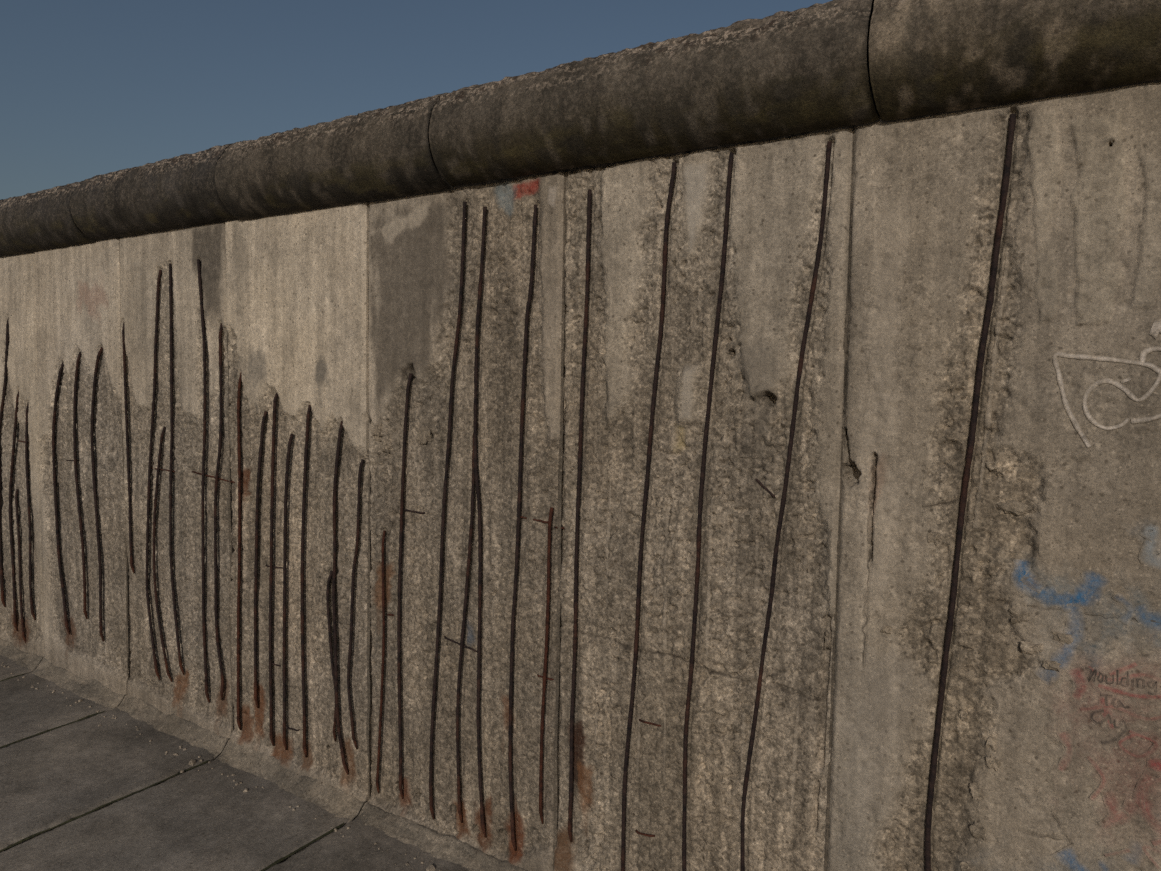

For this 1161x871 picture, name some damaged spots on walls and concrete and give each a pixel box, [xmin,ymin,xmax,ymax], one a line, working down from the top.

spalling [0,128,837,871]
damp [852,182,919,601]
spalling [866,105,1073,871]
damp [972,252,1012,529]
corrosion [236,678,316,777]
corrosion [339,733,358,795]
corrosion [451,790,528,866]
corrosion [554,718,597,871]
damp [832,636,939,856]